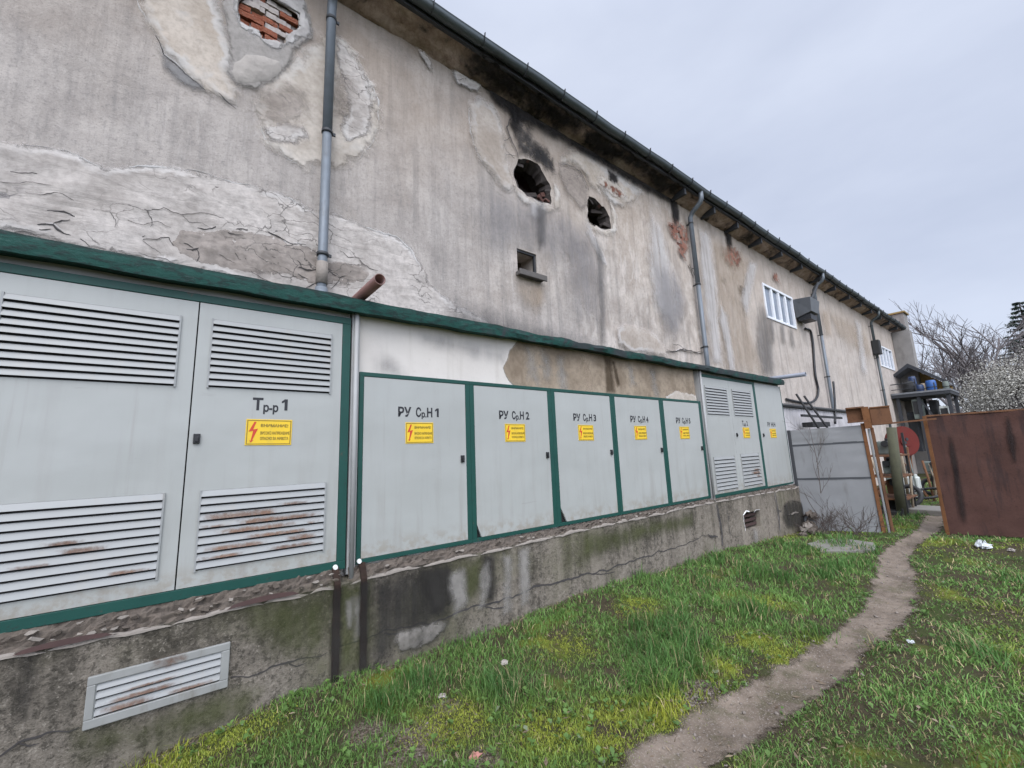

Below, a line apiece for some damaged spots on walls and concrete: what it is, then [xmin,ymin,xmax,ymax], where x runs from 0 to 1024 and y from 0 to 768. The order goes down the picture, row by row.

flaking render [137,0,380,168]
leakage [511,103,519,133]
flaking render [452,70,639,264]
crack [3,171,378,289]
flaking render [668,222,688,261]
flaking render [503,325,696,398]
corrosion [213,502,311,558]
spalling [0,484,805,660]
leakage [374,569,466,661]
crack [231,504,731,678]
leakage [481,550,529,605]